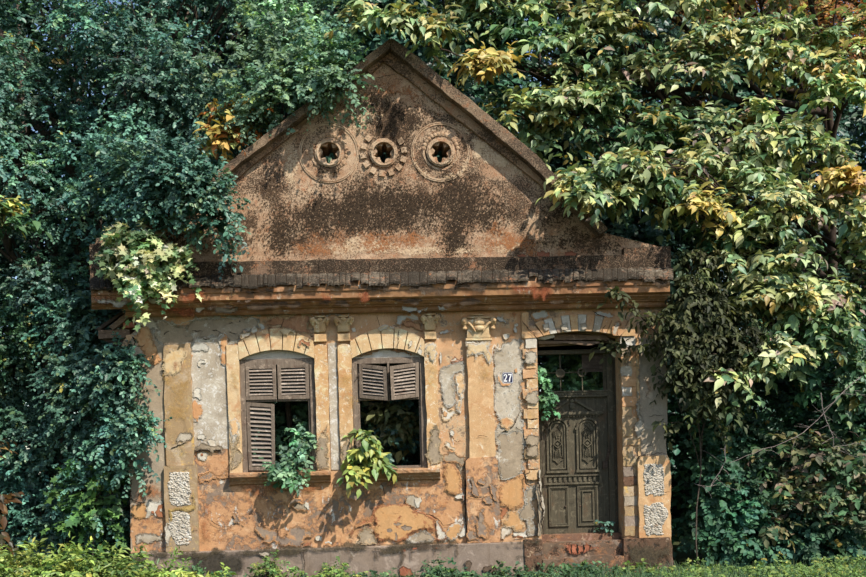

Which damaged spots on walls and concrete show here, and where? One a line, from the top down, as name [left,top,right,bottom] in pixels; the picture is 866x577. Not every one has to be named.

water stain [347,108,383,139]
water stain [282,147,302,185]
water stain [411,124,523,181]
water stain [327,234,520,259]
peeling [379,306,428,332]
peeling [192,387,205,422]
peeling [176,431,216,461]
peeling [350,316,540,552]